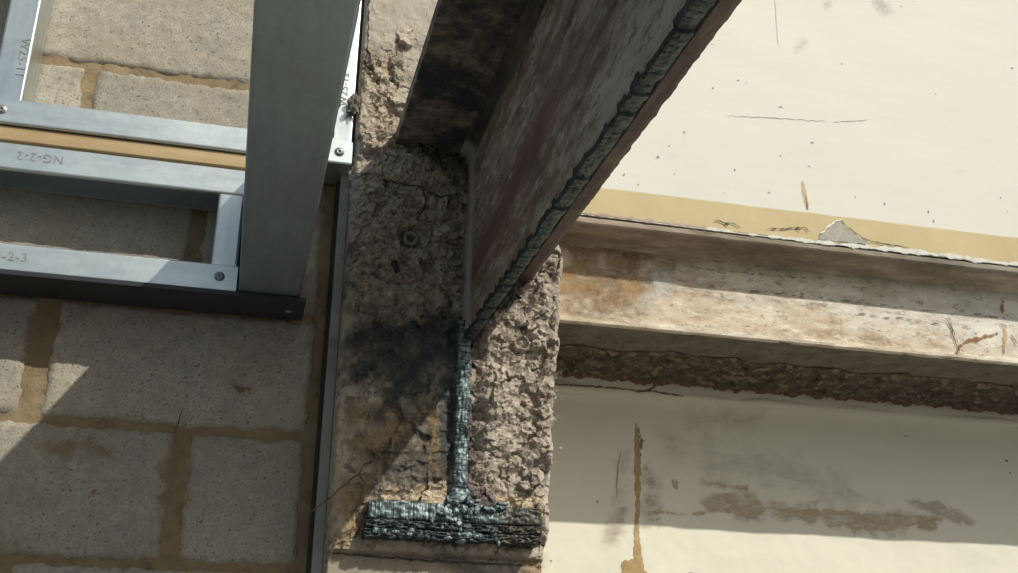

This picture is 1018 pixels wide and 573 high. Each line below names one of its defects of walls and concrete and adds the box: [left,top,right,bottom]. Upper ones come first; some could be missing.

peeling [586,212,735,232]
peeling [748,219,1018,266]
rust [956,326,1017,355]
spalling [475,258,561,520]
spalling [381,479,448,503]
leakage [694,483,971,533]